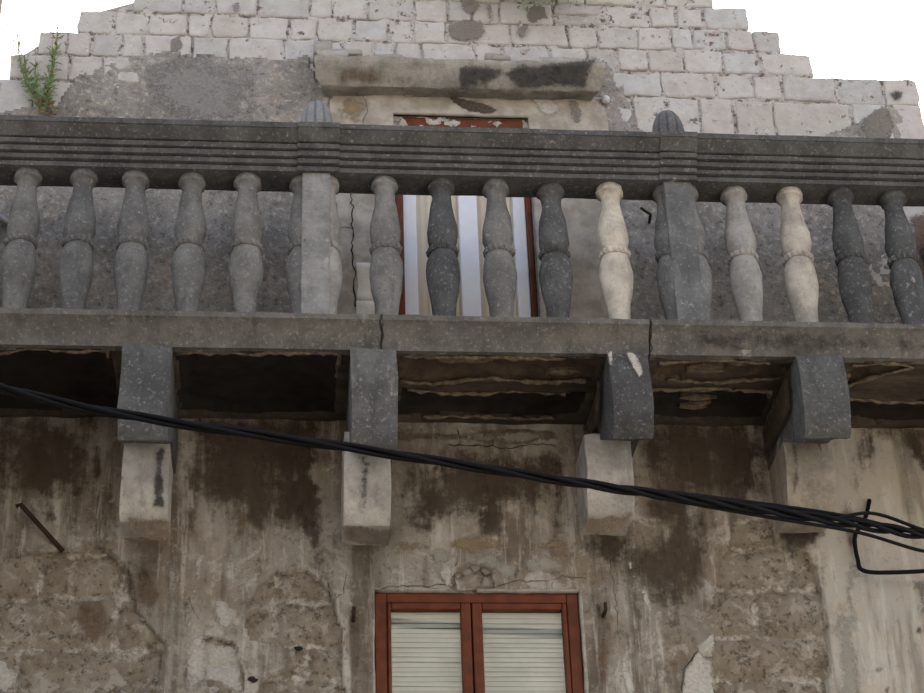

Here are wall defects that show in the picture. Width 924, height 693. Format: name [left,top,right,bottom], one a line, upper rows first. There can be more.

flaking render [0,549,165,693]
leakage [153,448,165,507]
leakage [188,418,321,577]
flaking render [186,572,345,693]
leakage [343,526,391,546]
leakage [402,451,562,553]
spalling [398,355,598,421]
peeling [627,352,642,377]
leakage [584,499,703,625]
leakage [644,374,790,499]
spalling [652,360,785,418]
flaking render [683,520,829,693]